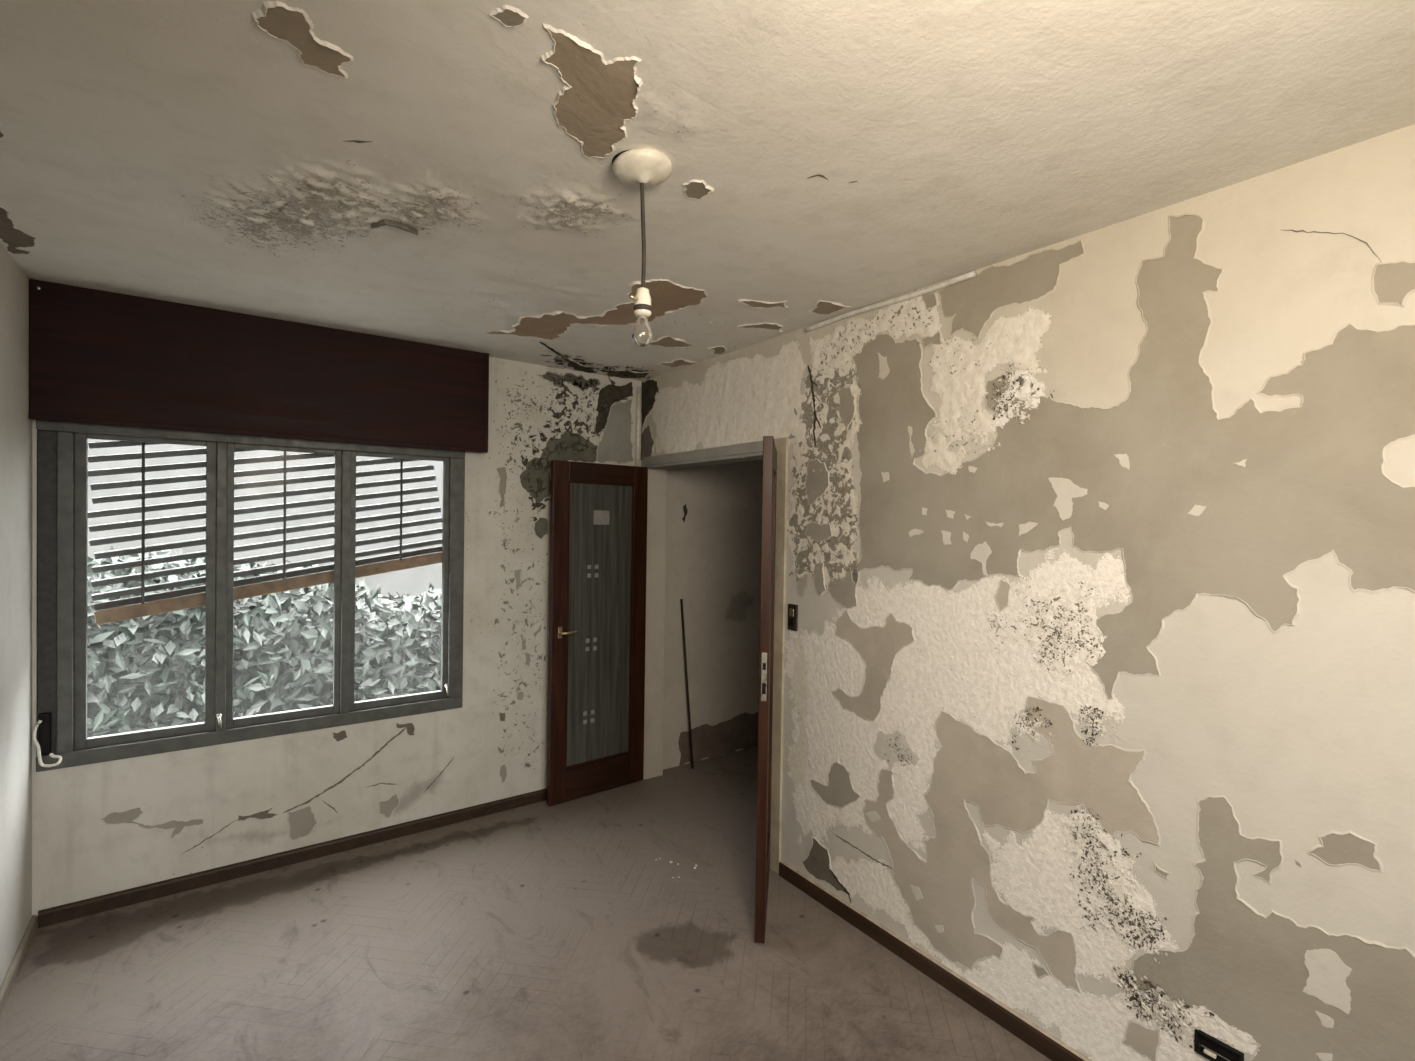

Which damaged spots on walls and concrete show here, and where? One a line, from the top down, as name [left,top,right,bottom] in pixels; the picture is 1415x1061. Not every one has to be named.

peeling [251,1,354,78]
peeling [489,5,643,158]
peeling [0,205,38,254]
crack [1284,230,1381,262]
water stain [991,360,1054,420]
peeling [479,279,789,785]
peeling [786,213,1415,1061]
peeling [333,730,347,742]
peeling [395,721,416,736]
peeling [237,805,318,841]
peeling [378,793,400,818]
water stain [784,544,1260,1061]